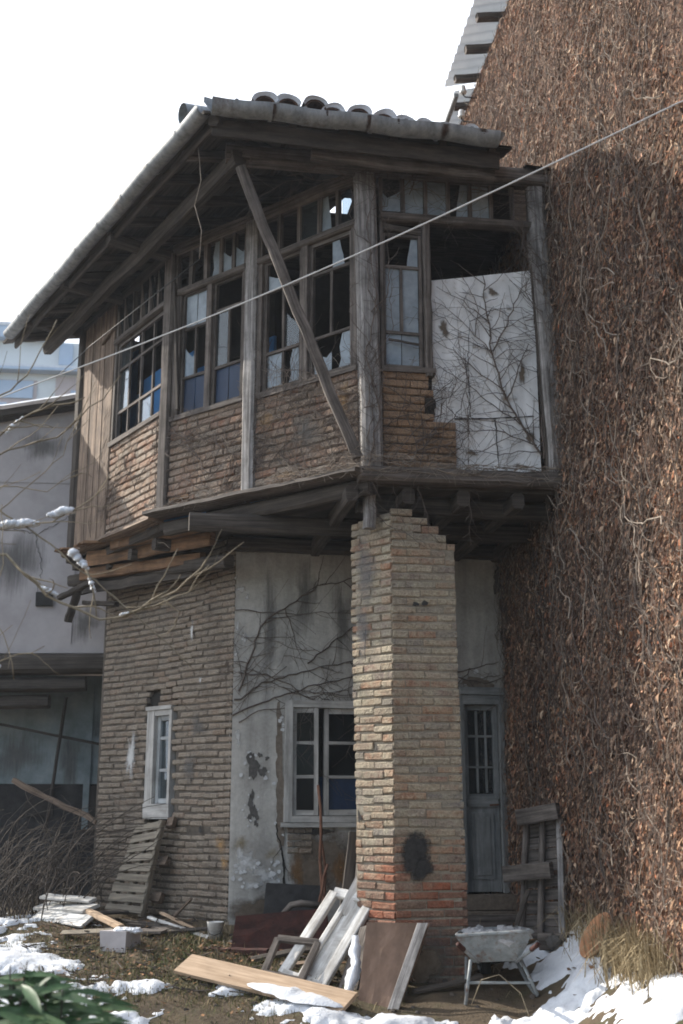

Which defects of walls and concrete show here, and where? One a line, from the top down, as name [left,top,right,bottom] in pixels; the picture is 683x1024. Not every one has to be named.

spalling [231,701,331,918]